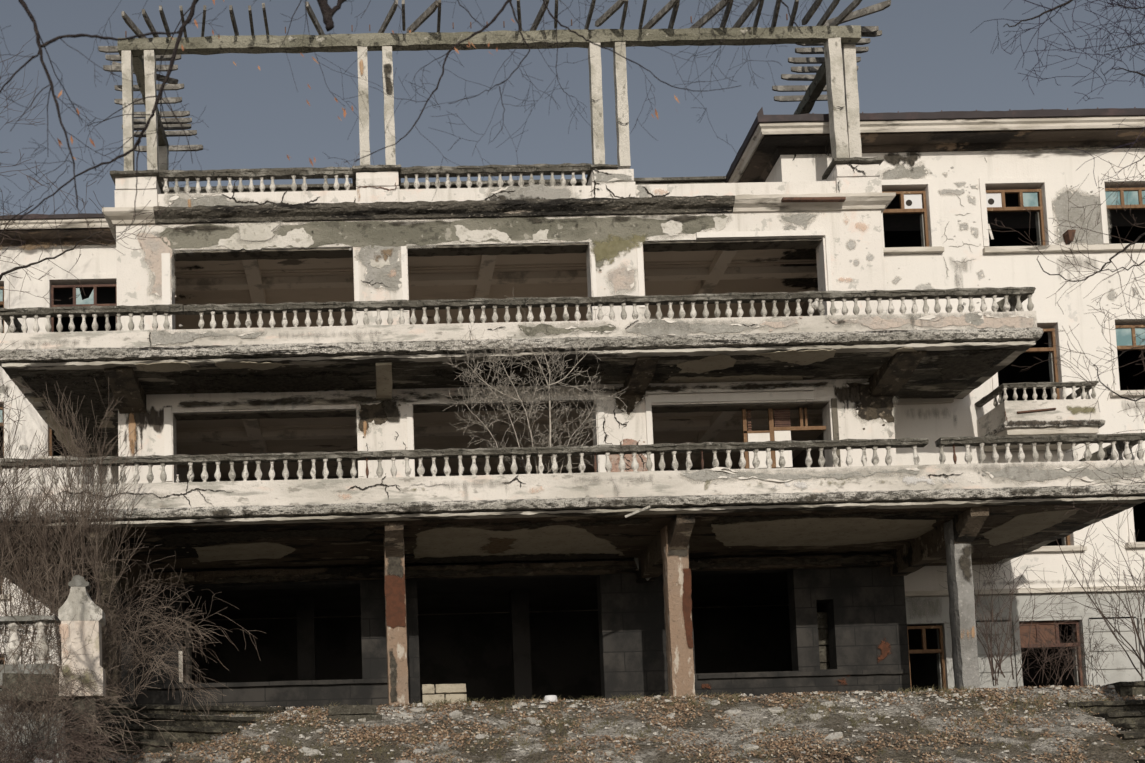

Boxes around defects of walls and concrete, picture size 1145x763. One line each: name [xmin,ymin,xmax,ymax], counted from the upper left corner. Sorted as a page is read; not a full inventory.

peeling [882,162,978,205]
peeling [1052,185,1109,245]
peeling [137,214,729,300]
peeling [663,347,843,384]
spalling [845,380,896,437]
crack [60,470,233,506]
crack [348,473,450,497]
rust [384,574,406,629]
rust [682,568,693,648]